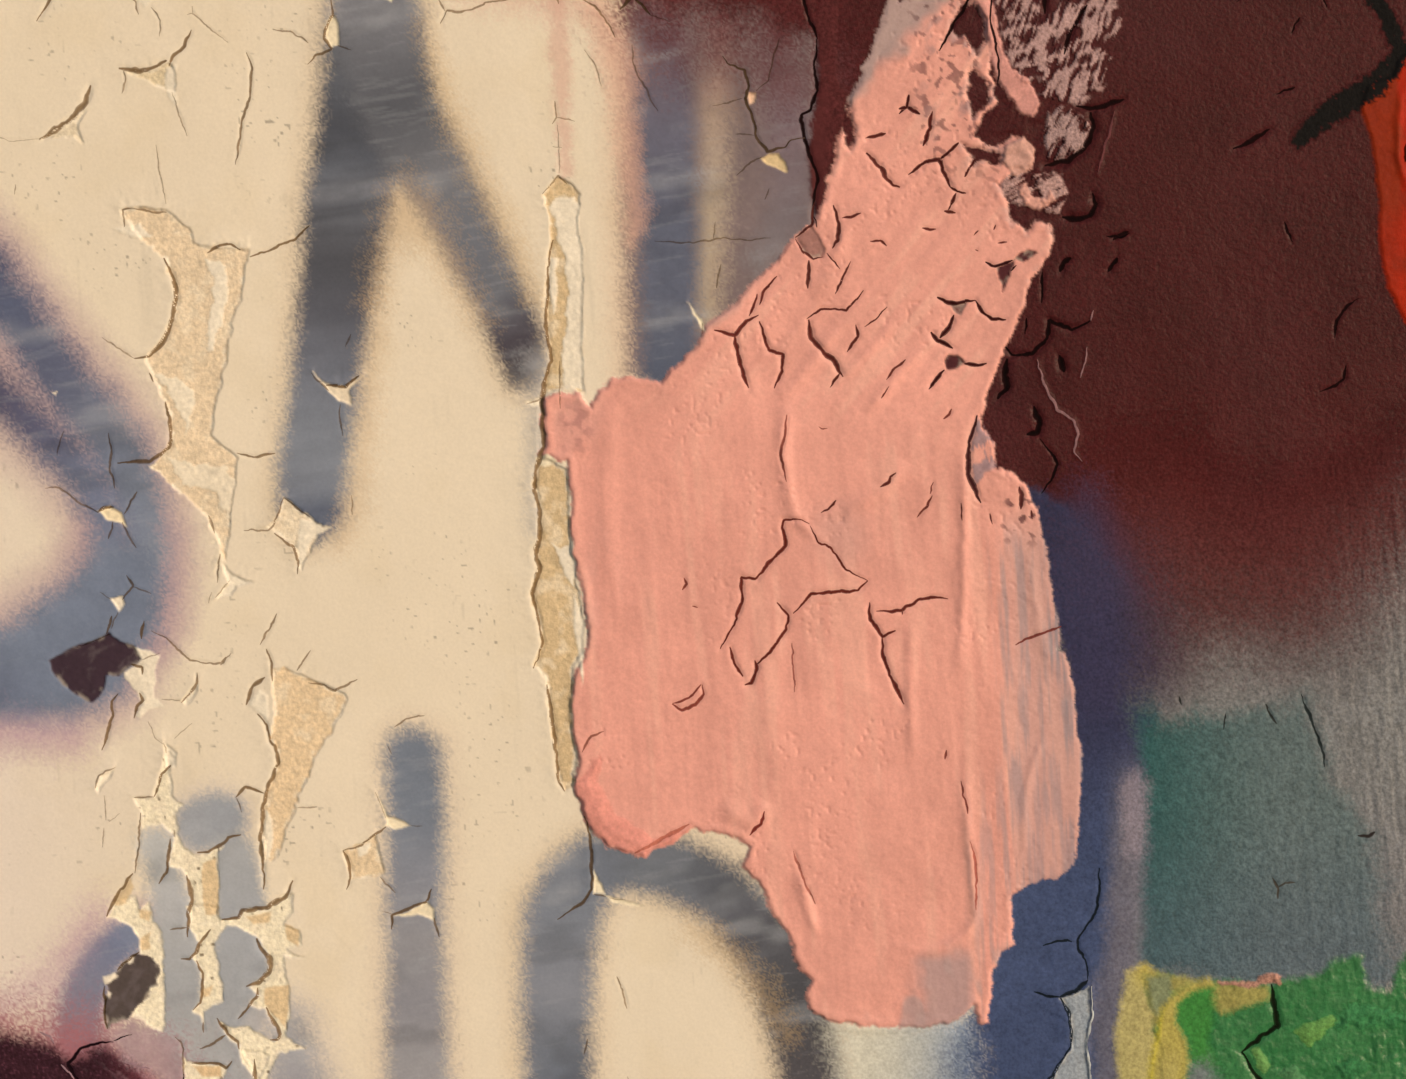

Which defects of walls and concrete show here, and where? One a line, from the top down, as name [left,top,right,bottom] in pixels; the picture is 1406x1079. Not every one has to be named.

peeling [308,0,351,64]
crack [799,0,887,246]
crack [866,94,1007,251]
crack [939,0,1000,81]
peeling [45,486,137,547]
peeling [102,204,330,603]
peeling [524,175,587,793]
crack [714,276,887,482]
crack [720,500,948,704]
crack [917,257,1091,524]
peeling [47,575,358,1079]
peeling [557,816,645,920]